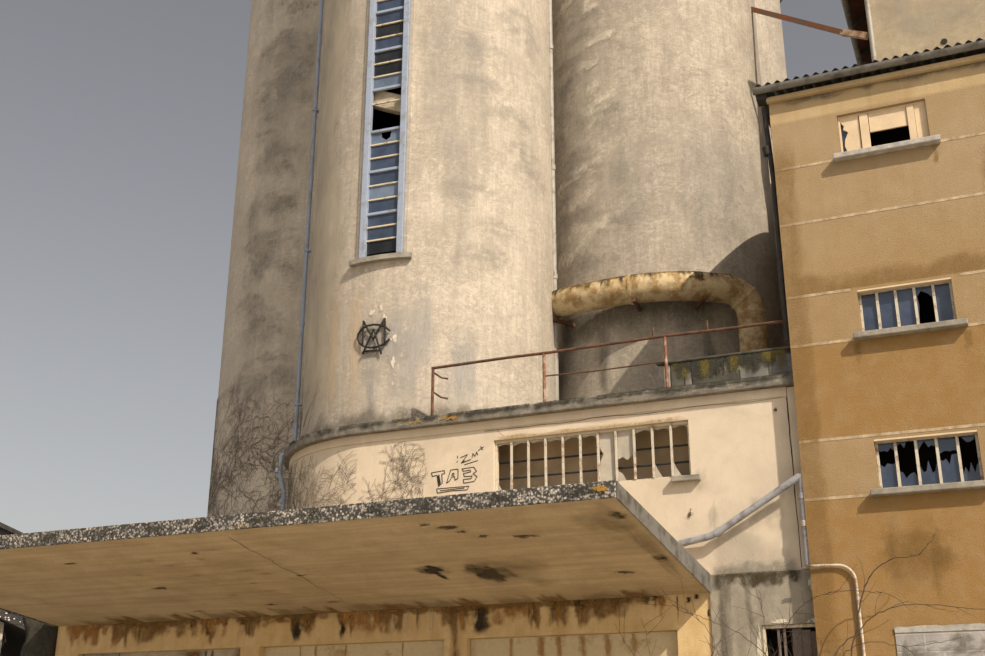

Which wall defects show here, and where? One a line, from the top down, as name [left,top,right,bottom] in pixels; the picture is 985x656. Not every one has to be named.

leakage [567,301,704,344]
leakage [67,596,679,656]